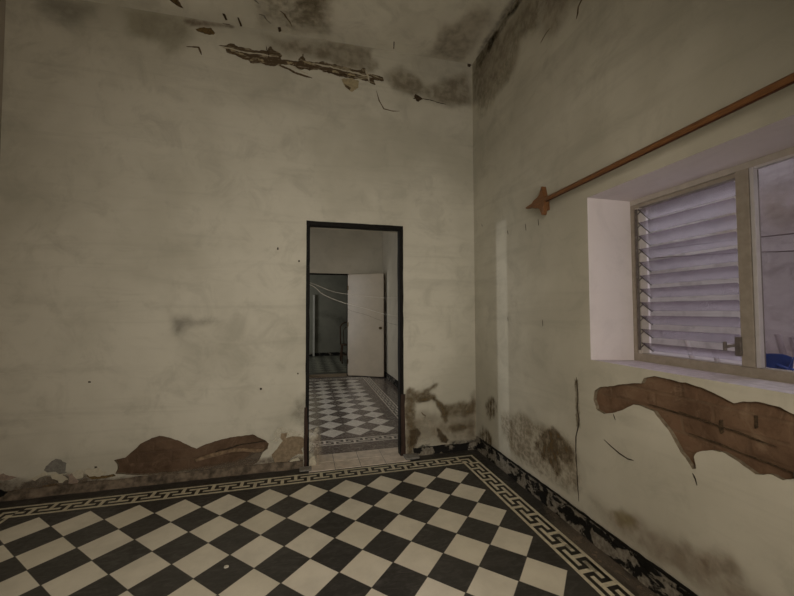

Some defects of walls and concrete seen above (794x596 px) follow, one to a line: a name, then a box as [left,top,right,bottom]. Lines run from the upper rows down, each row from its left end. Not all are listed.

peeling [191,22,215,35]
peeling [219,43,384,92]
spalling [87,429,318,479]
leakage [405,385,475,454]
leakage [510,420,577,485]
crack [573,377,581,500]
spalling [594,376,794,480]
peeling [479,438,698,596]